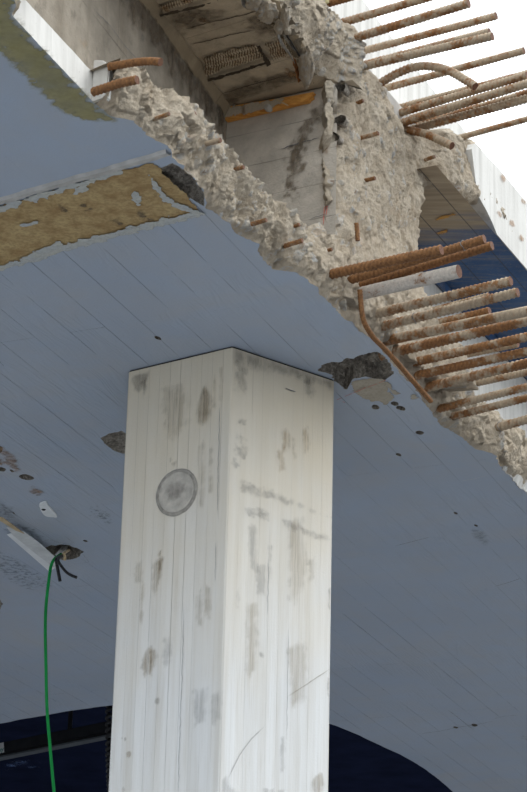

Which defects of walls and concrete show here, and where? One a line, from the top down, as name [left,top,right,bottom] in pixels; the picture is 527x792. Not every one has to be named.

damp [0,0,113,121]
spalling [276,0,527,150]
spalling [0,57,527,495]